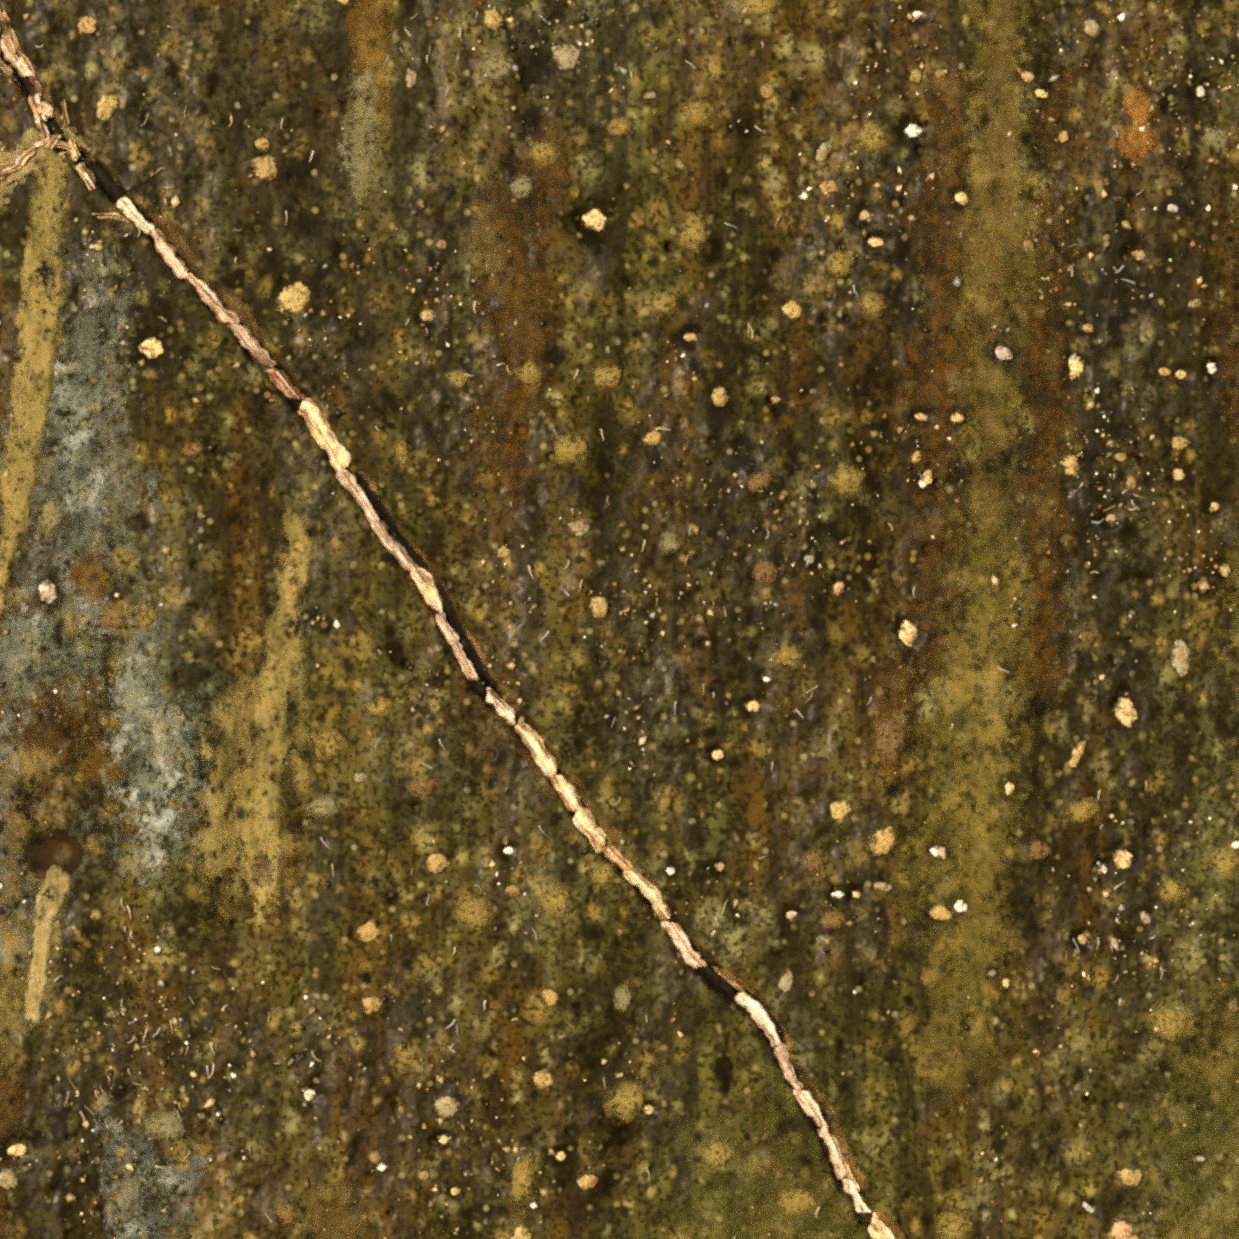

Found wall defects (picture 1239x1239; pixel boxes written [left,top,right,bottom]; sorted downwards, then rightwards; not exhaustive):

damp [0,147,72,614]
damp [0,742,72,1047]
damp [194,508,317,929]
crack [0,2,905,1239]
damp [893,0,1043,1112]
damp [1211,538,1239,696]